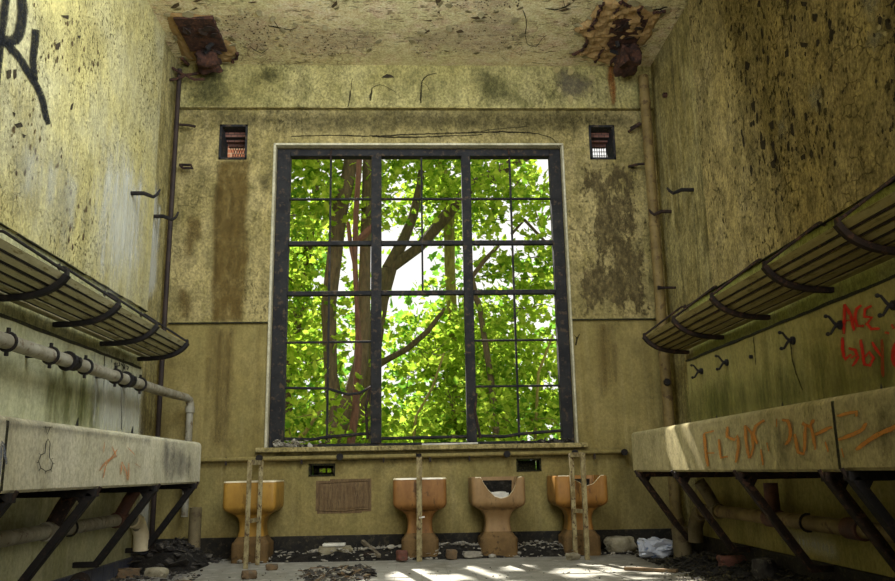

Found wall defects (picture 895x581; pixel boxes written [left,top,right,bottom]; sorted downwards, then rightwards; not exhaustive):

spalling [163,0,382,81]
spalling [569,0,672,66]
leakage [212,161,248,321]